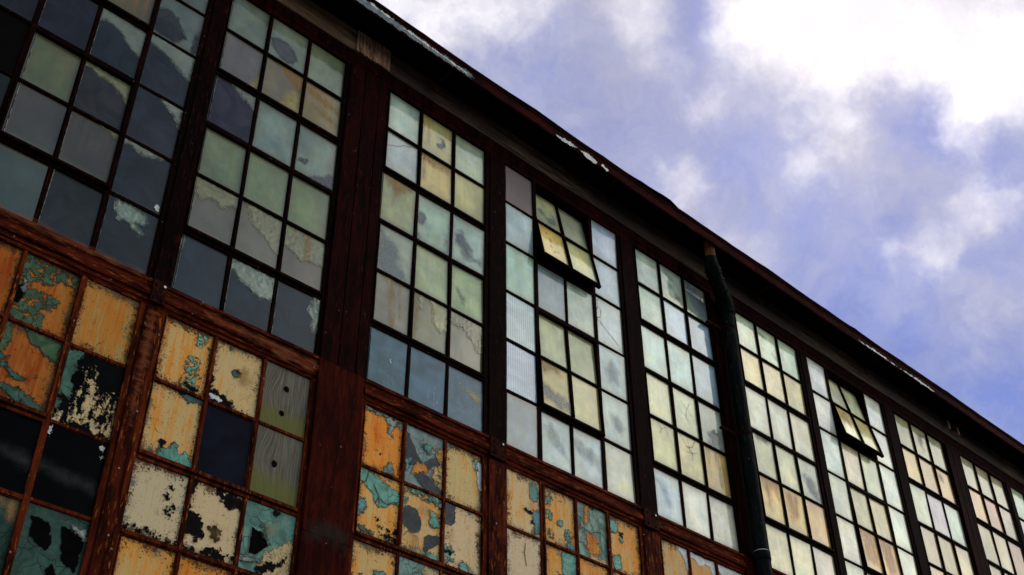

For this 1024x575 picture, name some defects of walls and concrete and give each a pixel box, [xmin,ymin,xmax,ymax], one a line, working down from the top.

peeling [0,254,119,459]
peeling [179,333,235,409]
peeling [232,369,247,384]
peeling [29,515,88,575]
peeling [156,438,192,467]
peeling [121,479,293,575]
peeling [357,405,469,575]
peeling [472,459,481,491]
peeling [522,482,624,575]